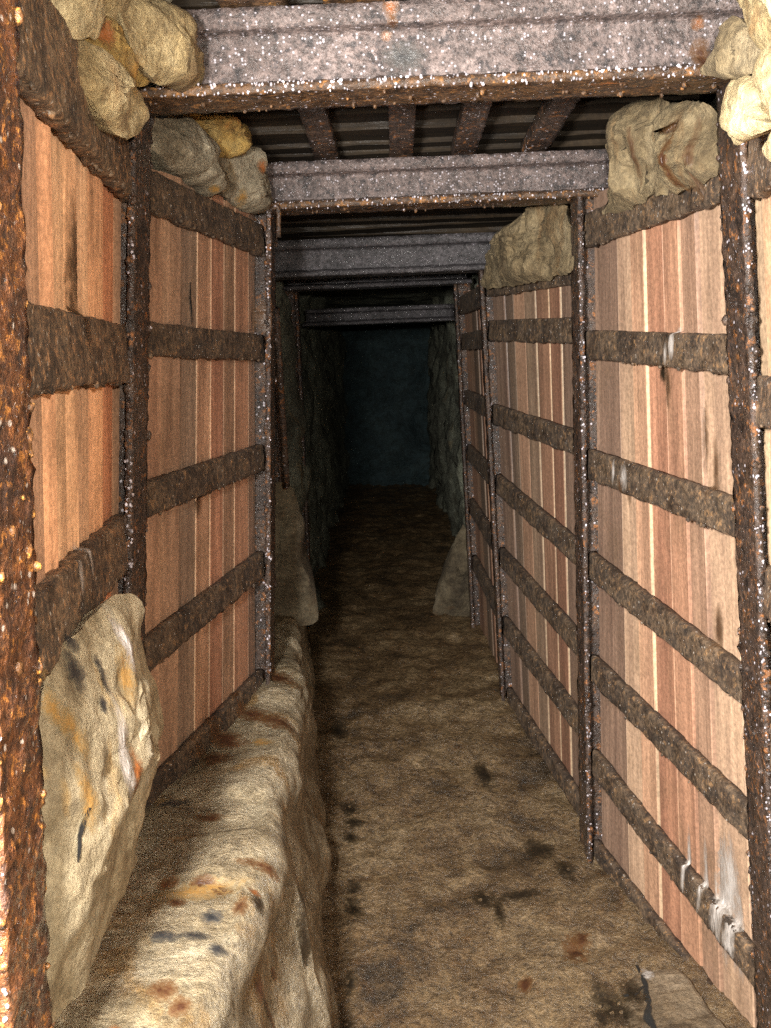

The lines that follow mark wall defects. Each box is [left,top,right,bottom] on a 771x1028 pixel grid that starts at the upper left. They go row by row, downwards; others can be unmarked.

damp [681,839,691,890]
damp [698,842,743,959]
crack [624,965,656,1028]